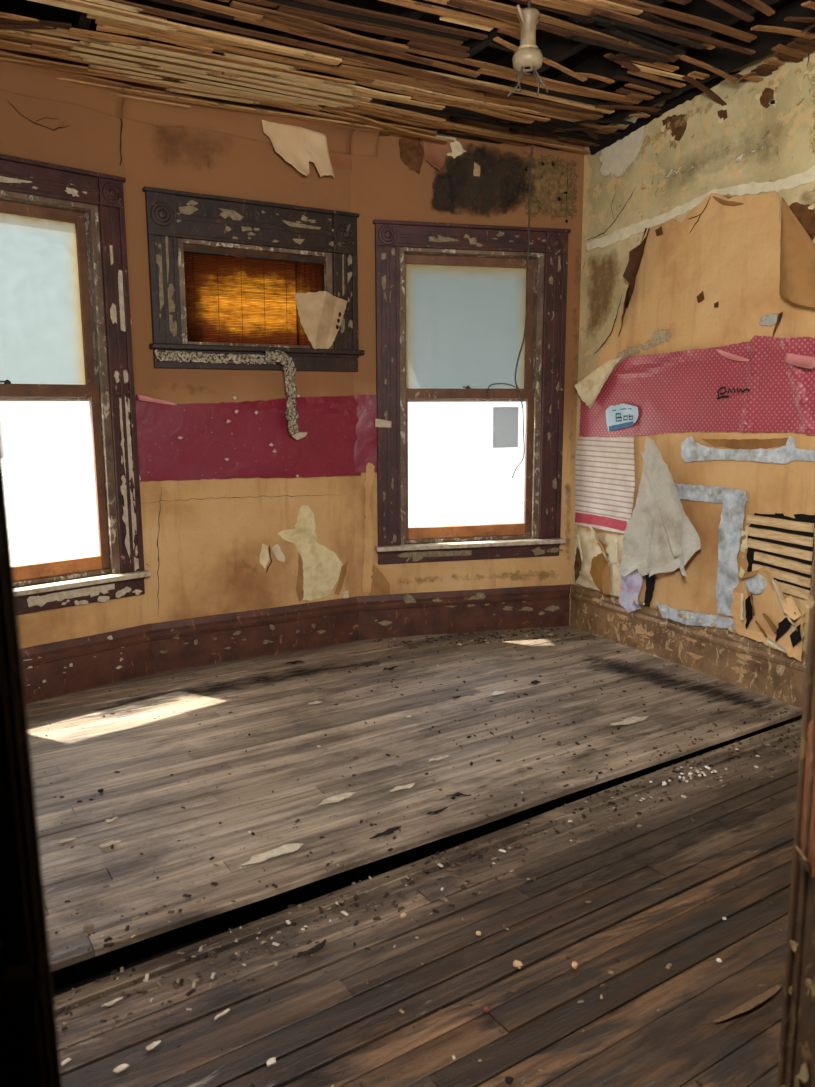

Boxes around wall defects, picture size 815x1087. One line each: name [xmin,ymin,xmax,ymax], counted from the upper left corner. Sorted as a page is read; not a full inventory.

peeling [0,176,38,190]
peeling [219,208,260,239]
peeling [262,120,352,178]
peeling [589,70,742,177]
peeling [587,165,815,251]
flaking render [755,80,781,108]
peeling [109,245,132,331]
peeling [155,236,177,337]
peeling [262,211,353,333]
peeling [114,370,141,571]
peeling [27,583,142,607]
flaking render [259,505,349,602]